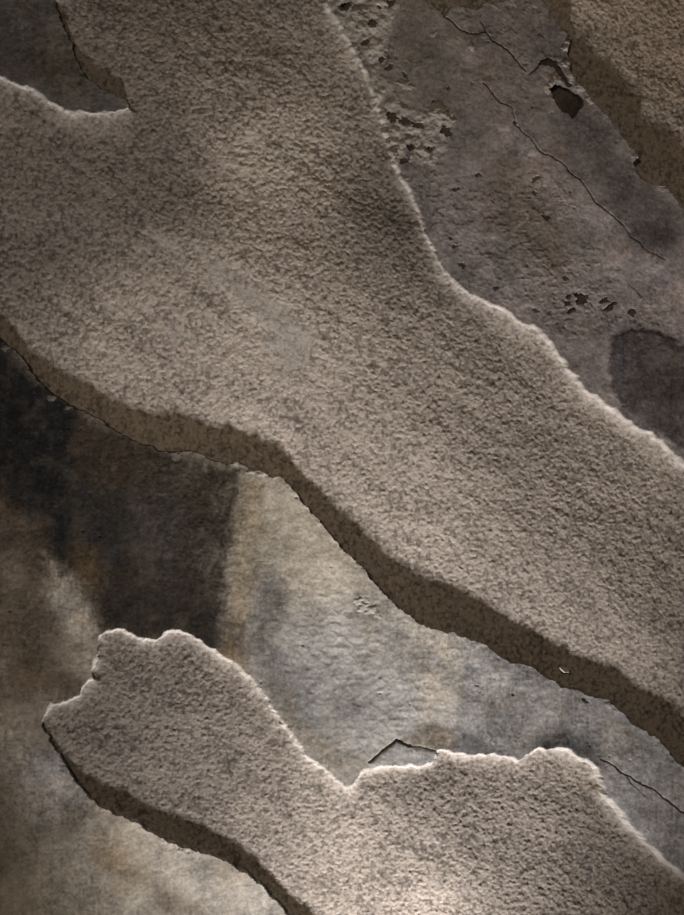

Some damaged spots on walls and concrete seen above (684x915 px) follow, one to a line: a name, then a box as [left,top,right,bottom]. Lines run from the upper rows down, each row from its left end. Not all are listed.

spalling [0,75,130,116]
crack [444,16,541,75]
spalling [322,0,684,468]
crack [483,82,666,260]
spalling [41,628,684,915]
crack [601,759,684,814]